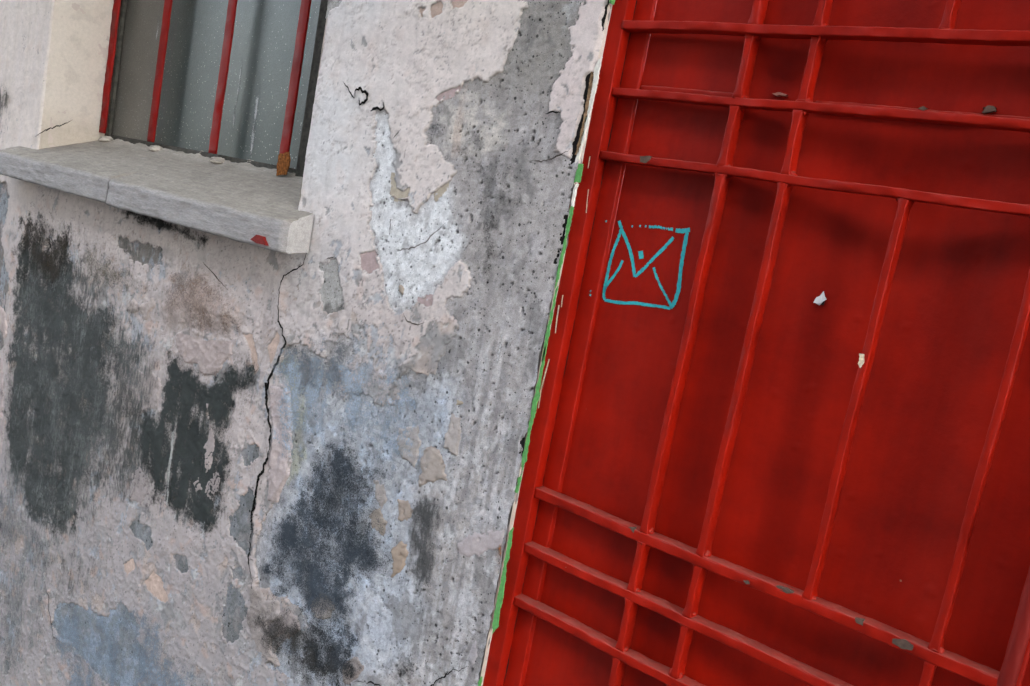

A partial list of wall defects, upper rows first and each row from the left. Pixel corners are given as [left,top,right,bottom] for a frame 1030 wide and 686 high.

leakage [0,211,257,686]
peeling [173,554,189,573]
peeling [175,333,232,376]
crack [247,253,336,589]
leakage [249,336,422,686]
spalling [222,0,586,686]